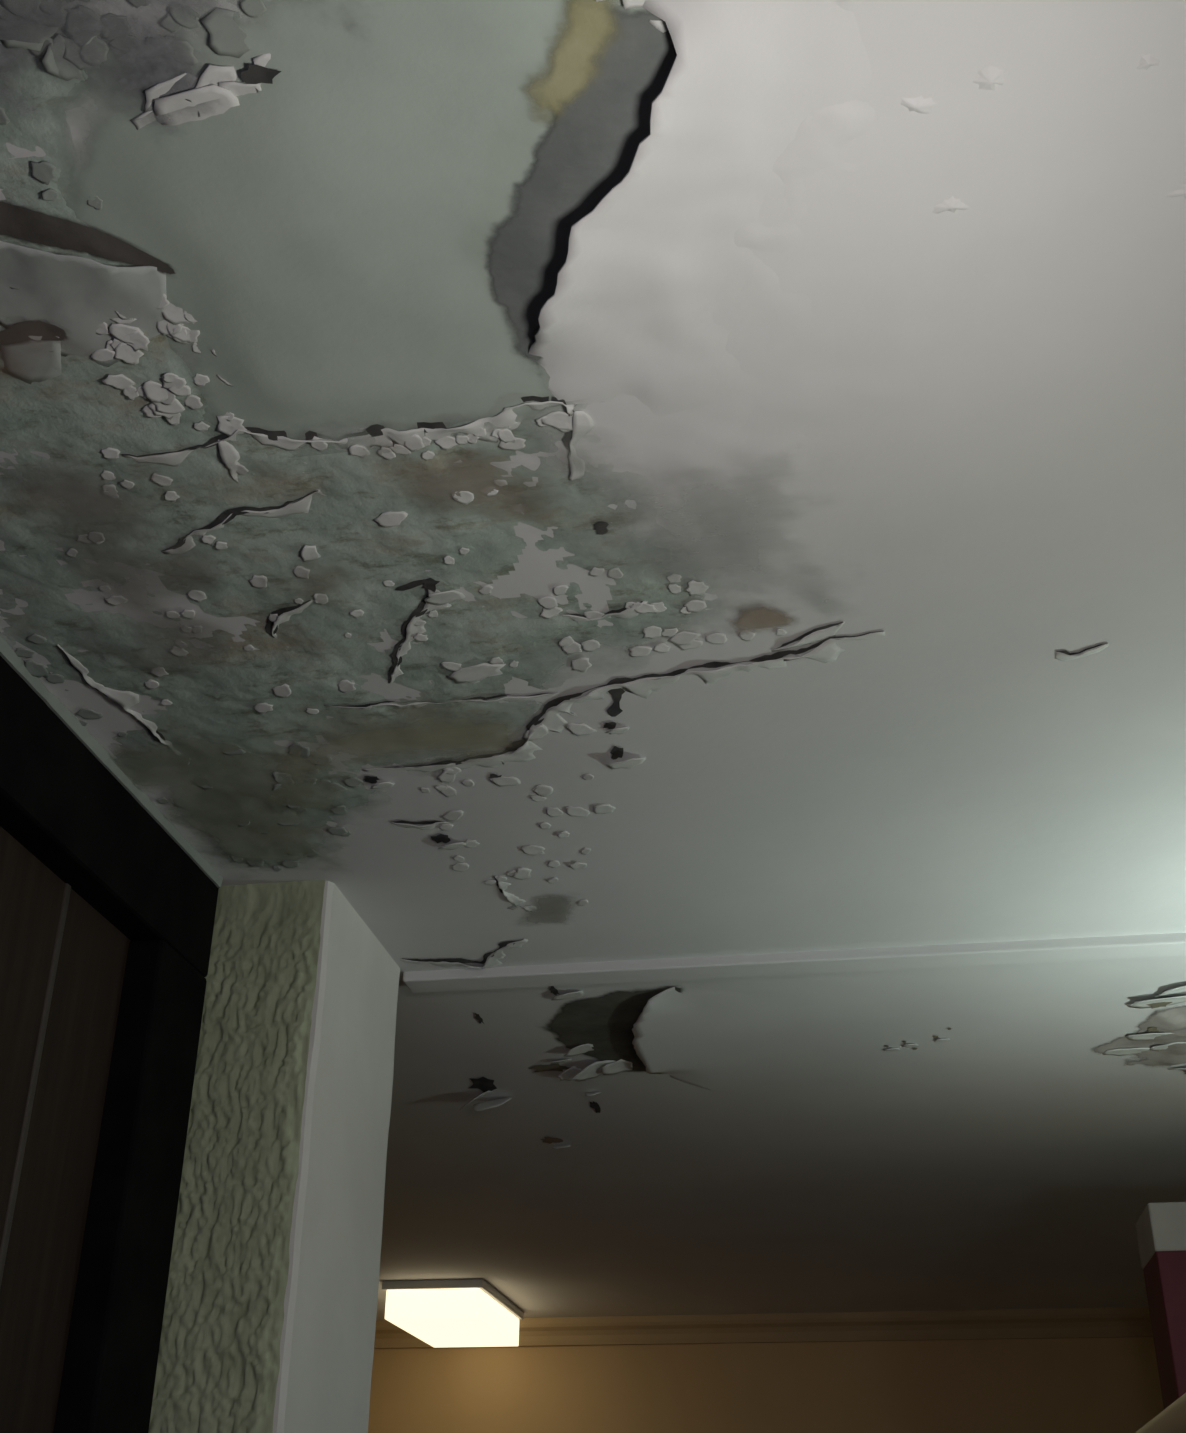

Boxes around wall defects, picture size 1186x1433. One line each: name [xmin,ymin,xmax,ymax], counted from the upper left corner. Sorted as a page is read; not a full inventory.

leakage [0,0,215,227]
leakage [0,235,133,267]
peeling [0,0,873,460]
peeling [101,447,134,498]
crack [122,396,595,555]
peeling [452,479,508,504]
peeling [293,545,328,605]
leakage [0,316,700,866]
crack [324,579,885,772]
crack [391,820,449,830]
peeling [529,986,794,1113]
peeling [1094,985,1186,1074]